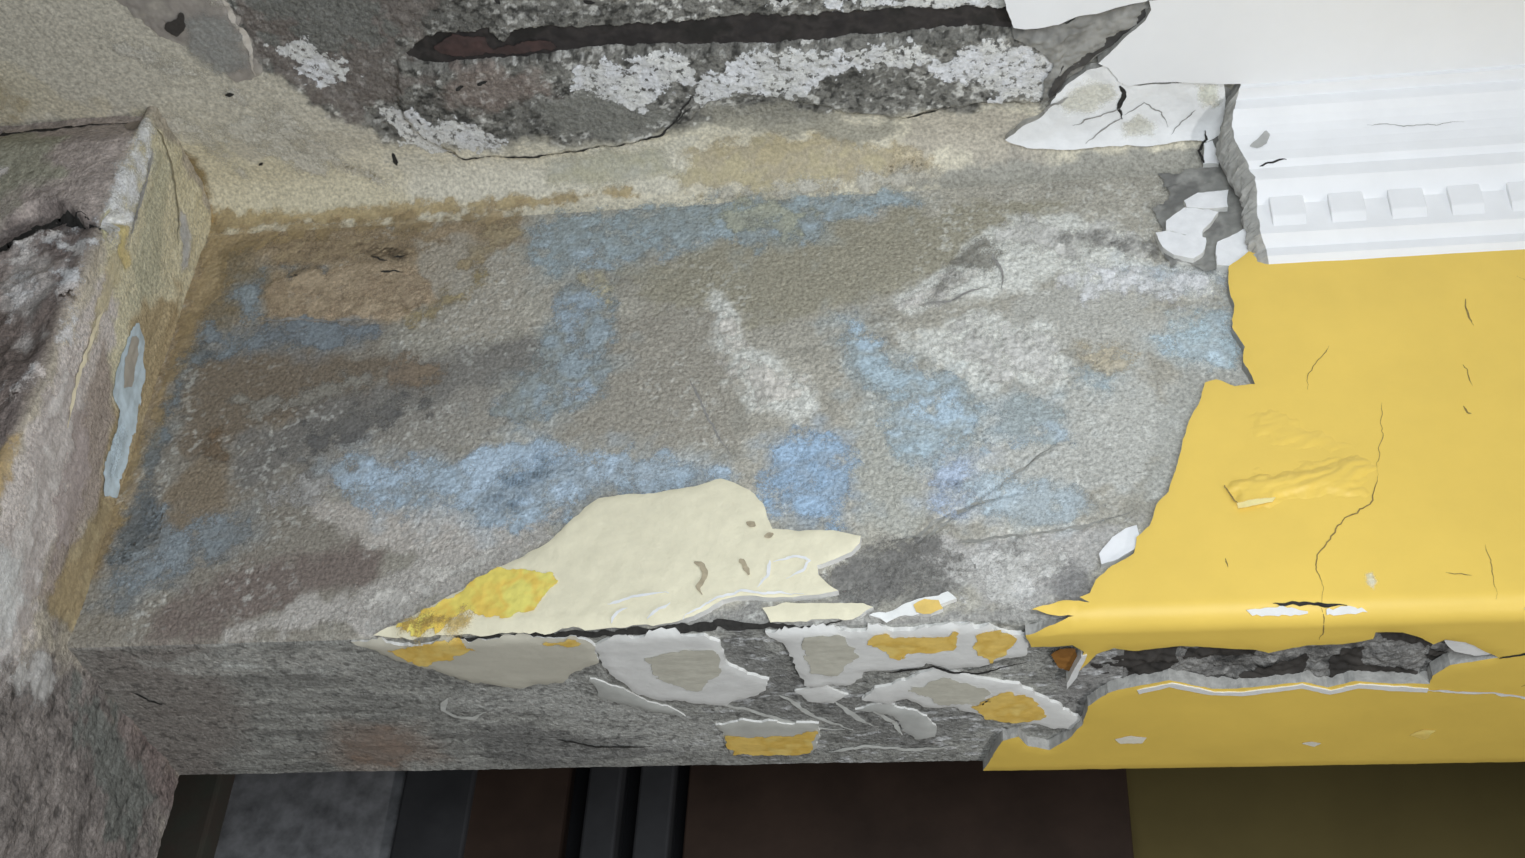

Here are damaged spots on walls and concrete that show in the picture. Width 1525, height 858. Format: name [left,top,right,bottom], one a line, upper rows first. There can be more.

crack [0,121,141,176]
spalling [0,0,1248,273]
crack [1005,62,1226,150]
peeling [1250,131,1270,148]
crack [0,210,116,321]
flaking render [67,175,1525,775]
crack [1315,404,1384,640]